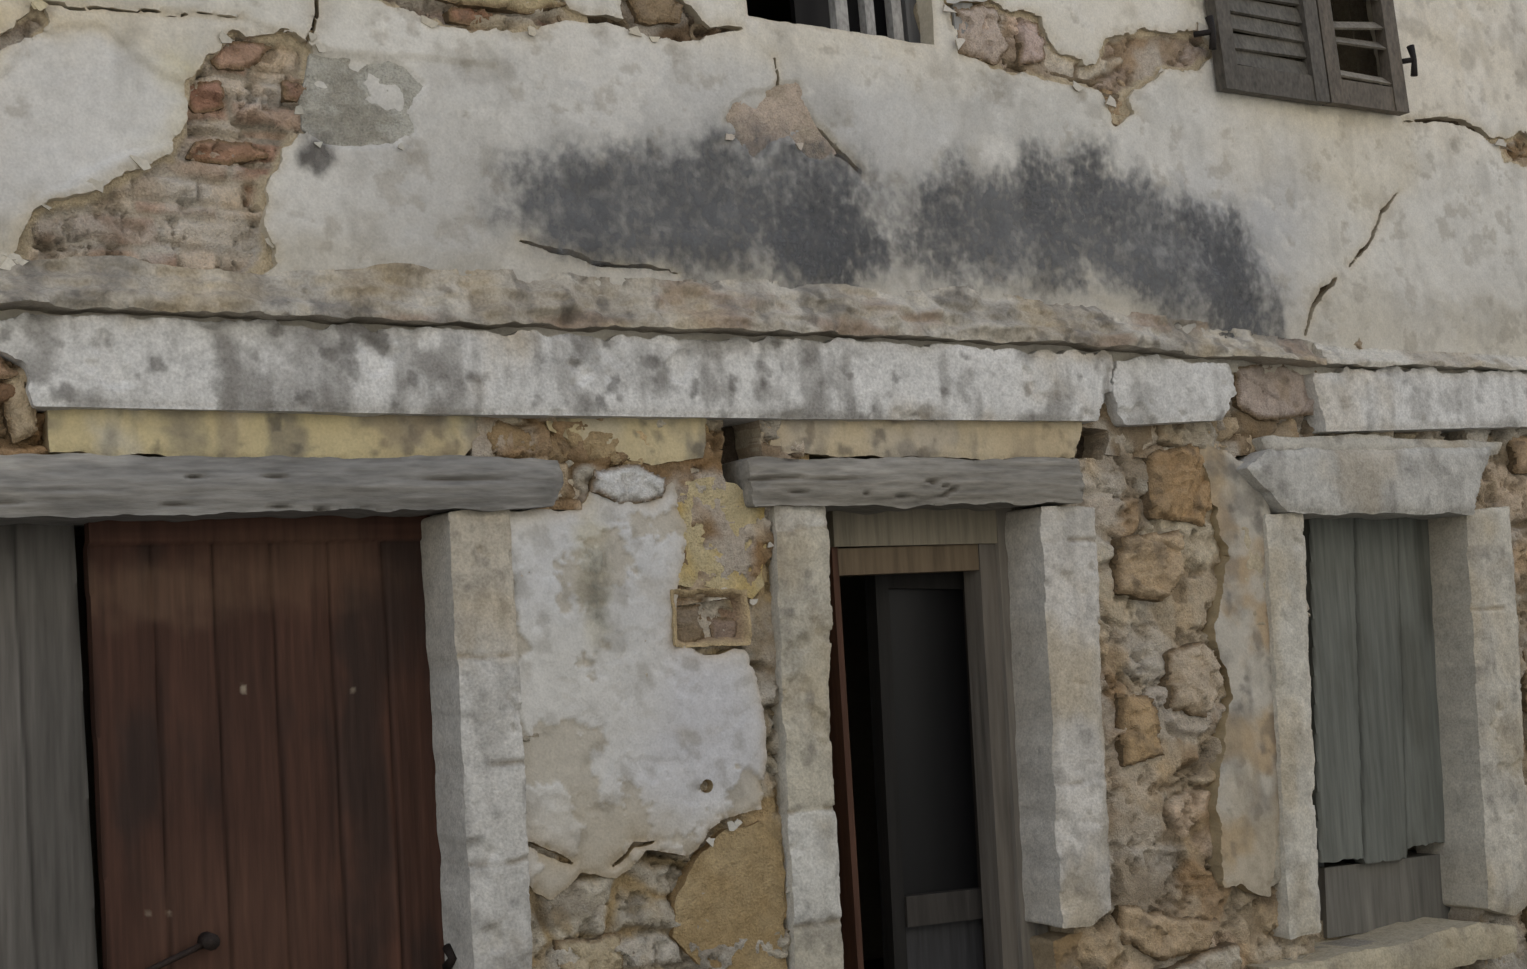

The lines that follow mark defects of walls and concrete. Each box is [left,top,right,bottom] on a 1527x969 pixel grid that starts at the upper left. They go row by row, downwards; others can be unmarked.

flaking render [0,0,423,275]
flaking render [378,0,734,42]
water stain [515,129,886,287]
flaking render [943,1,1212,127]
flaking render [465,417,809,969]